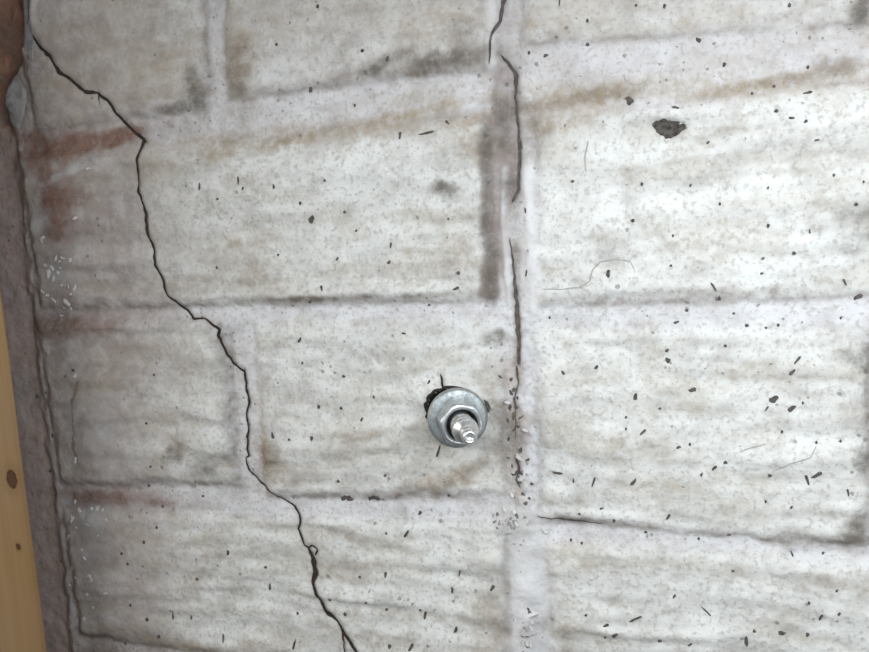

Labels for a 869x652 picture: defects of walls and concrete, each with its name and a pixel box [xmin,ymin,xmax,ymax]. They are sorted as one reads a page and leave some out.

crack [489,0,522,202]
crack [31,34,357,652]
crack [509,239,521,487]